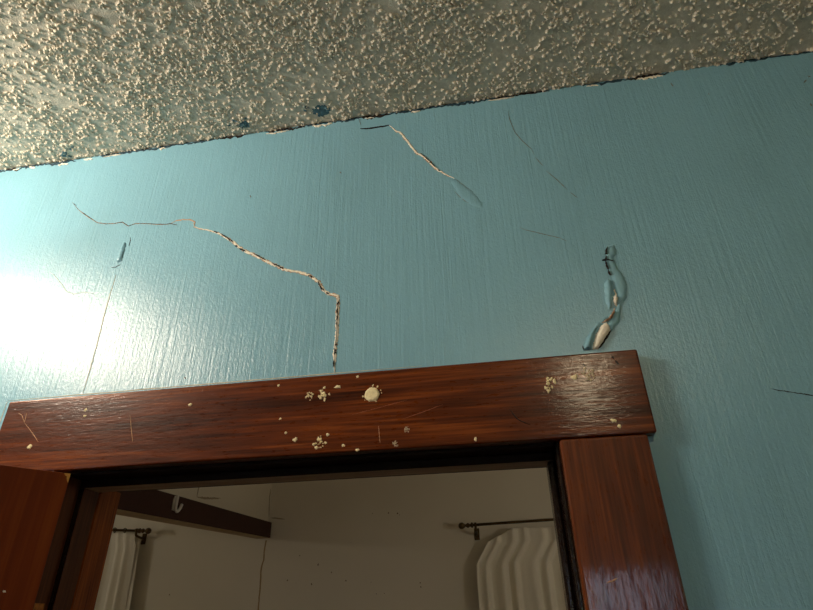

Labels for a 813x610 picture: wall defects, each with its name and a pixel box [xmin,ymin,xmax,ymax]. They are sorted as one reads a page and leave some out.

crack [583,72,669,87]
crack [720,51,813,66]
crack [0,134,246,173]
crack [266,90,576,203]
crack [50,265,119,394]
crack [72,202,340,372]
peeling [582,245,627,350]